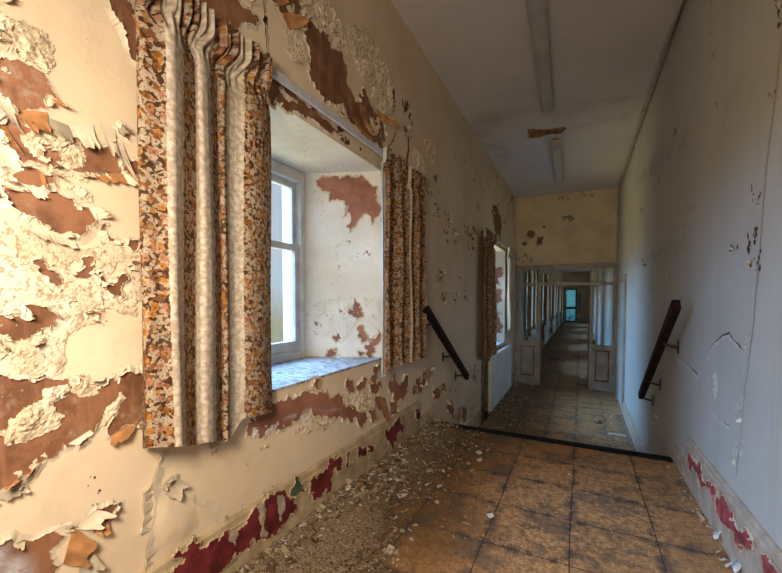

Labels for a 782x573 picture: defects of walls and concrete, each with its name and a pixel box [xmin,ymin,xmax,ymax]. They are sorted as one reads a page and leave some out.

crack [262,0,271,59]
peeling [269,0,413,160]
peeling [0,0,141,302]
peeling [315,174,381,243]
peeling [0,302,63,350]
peeling [0,364,143,501]
peeling [83,307,106,323]
peeling [243,298,472,451]
peeling [0,489,125,573]
peeling [163,443,375,573]
peeling [685,451,781,573]